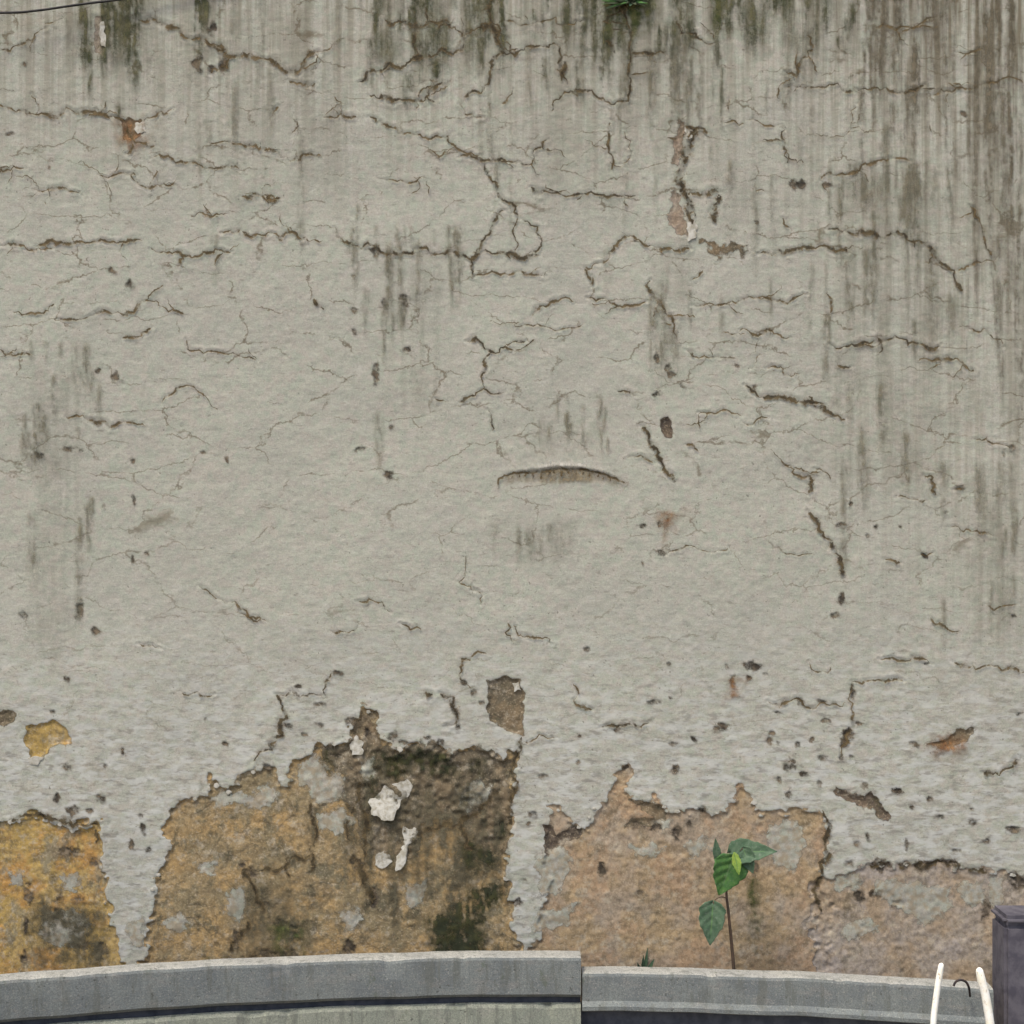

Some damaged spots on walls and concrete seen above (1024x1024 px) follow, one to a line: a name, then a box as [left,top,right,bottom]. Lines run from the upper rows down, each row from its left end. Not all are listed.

water stain [79,0,143,89]
water stain [563,0,653,91]
water stain [712,0,809,70]
crack [0,0,664,276]
spalling [671,119,693,165]
water stain [967,0,1014,188]
crack [436,101,908,451]
crack [761,206,992,291]
crack [636,427,675,481]
crack [771,449,845,576]
spalling [460,675,525,736]
peeling [0,702,1024,987]